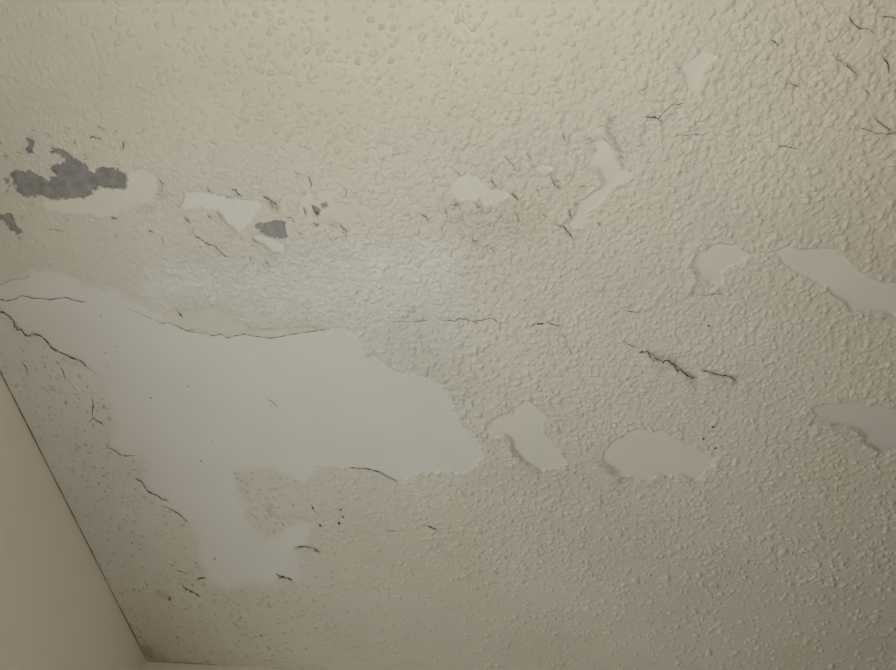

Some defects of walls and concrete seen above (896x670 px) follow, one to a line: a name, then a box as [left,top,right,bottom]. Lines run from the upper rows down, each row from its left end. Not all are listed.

spalling [0,130,163,240]
peeling [177,188,301,243]
crack [0,273,95,378]
crack [625,342,736,384]
crack [0,372,213,665]